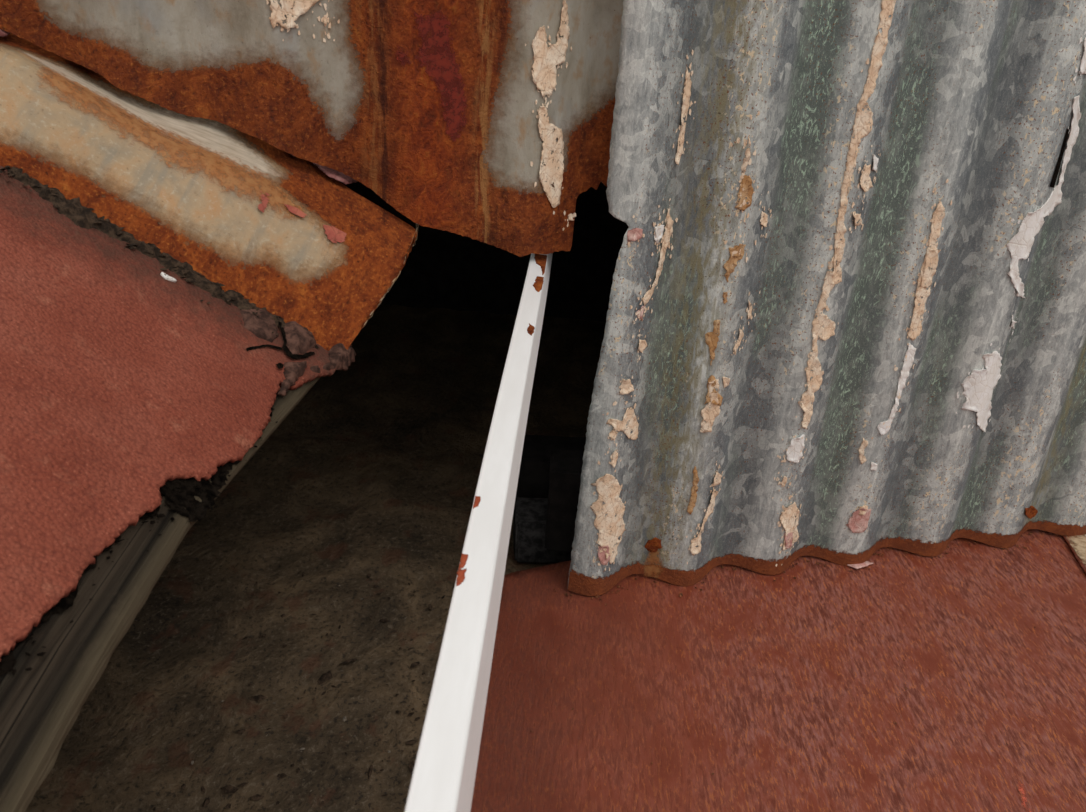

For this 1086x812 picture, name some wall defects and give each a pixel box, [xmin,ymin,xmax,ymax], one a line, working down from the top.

corrosion [0,0,616,351]
peeling [525,0,576,231]
peeling [673,49,696,165]
peeling [1006,32,1086,298]
crack [1050,128,1069,188]
peeling [627,198,678,363]
peeling [772,0,896,567]
peeling [858,179,952,471]
peeling [956,310,1017,432]
corrosion [456,554,468,586]
peeling [590,374,639,571]
corrosion [568,506,1086,596]